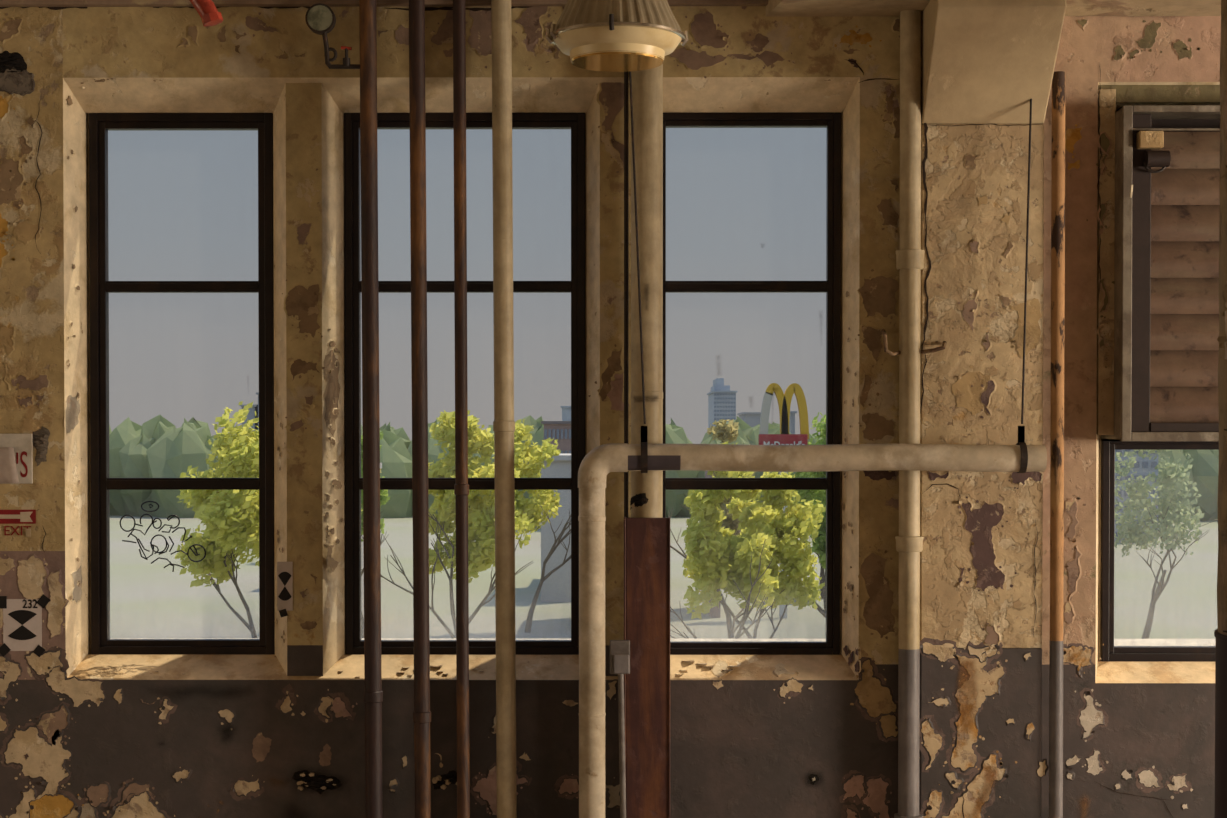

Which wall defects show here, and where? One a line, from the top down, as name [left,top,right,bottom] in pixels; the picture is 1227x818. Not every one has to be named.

spalling [0,13,35,123]
peeling [0,116,45,269]
peeling [0,324,50,466]
peeling [958,497,1017,597]
peeling [1063,495,1086,625]
peeling [0,547,178,818]
peeling [230,733,272,801]
peeling [275,683,357,723]
peeling [839,770,893,818]
peeling [919,621,1036,818]
peeling [1063,643,1109,781]
peeling [1114,766,1193,811]